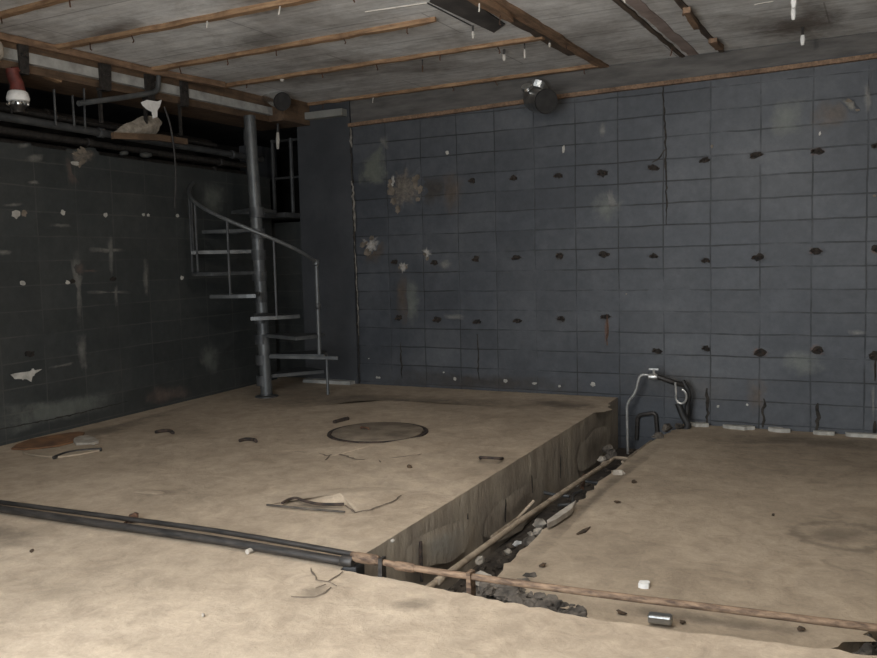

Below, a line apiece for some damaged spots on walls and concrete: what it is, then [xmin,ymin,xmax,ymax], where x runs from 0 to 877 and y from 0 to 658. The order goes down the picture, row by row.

peeling [66,146,99,168]
crack [652,86,668,225]
spalling [384,160,428,215]
peeling [359,233,381,256]
spalling [9,368,42,383]
corrosion [11,431,85,450]
spalling [522,424,877,653]